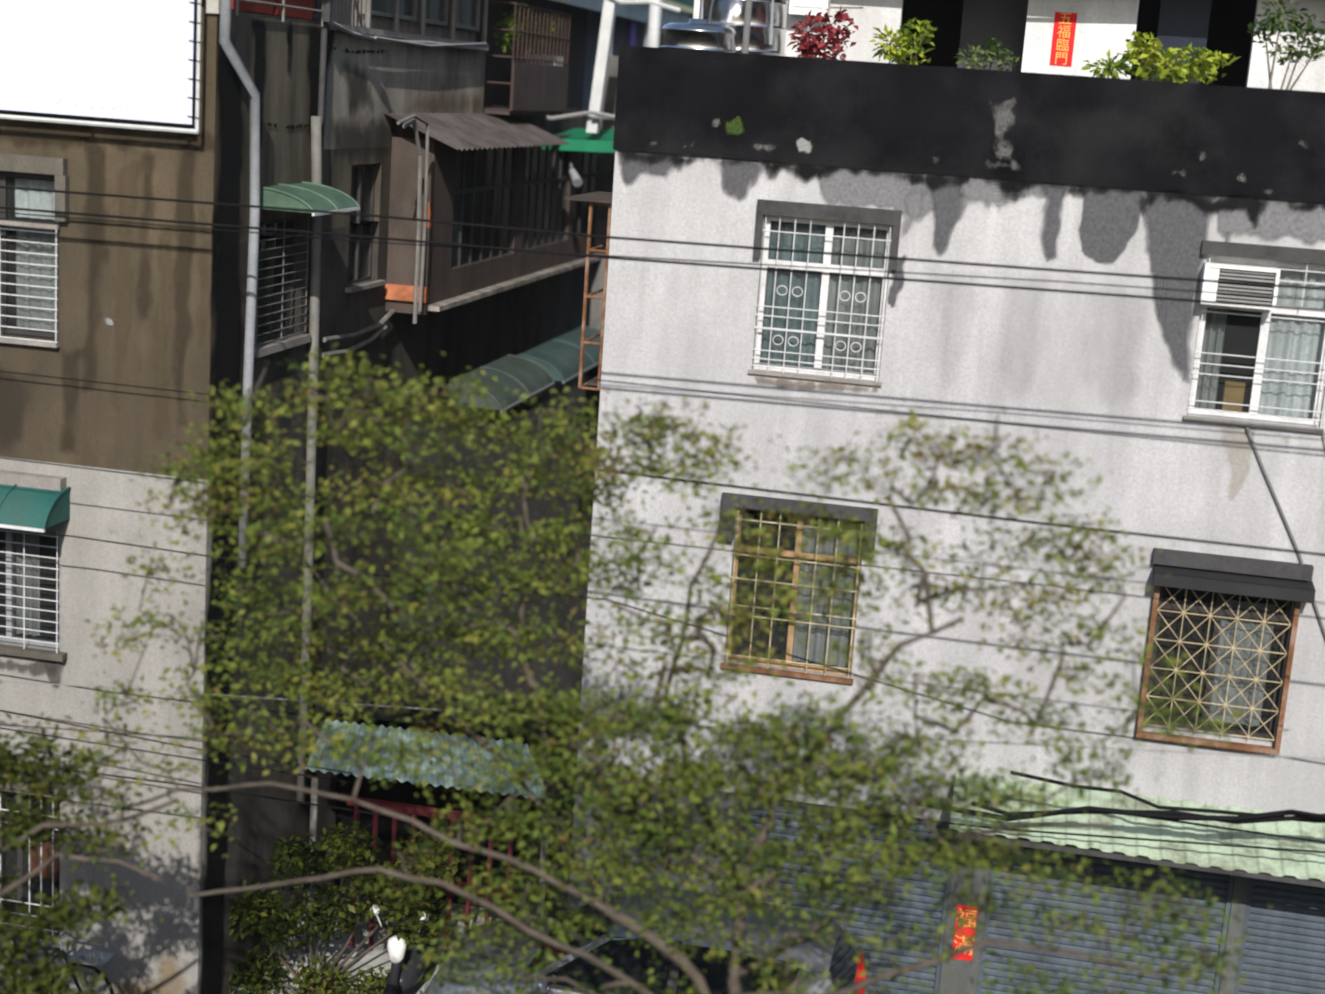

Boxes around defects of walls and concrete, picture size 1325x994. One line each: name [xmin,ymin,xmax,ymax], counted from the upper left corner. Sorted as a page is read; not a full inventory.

leakage [307,27,396,159]
peeling [994,100,1018,169]
leakage [722,158,1325,380]